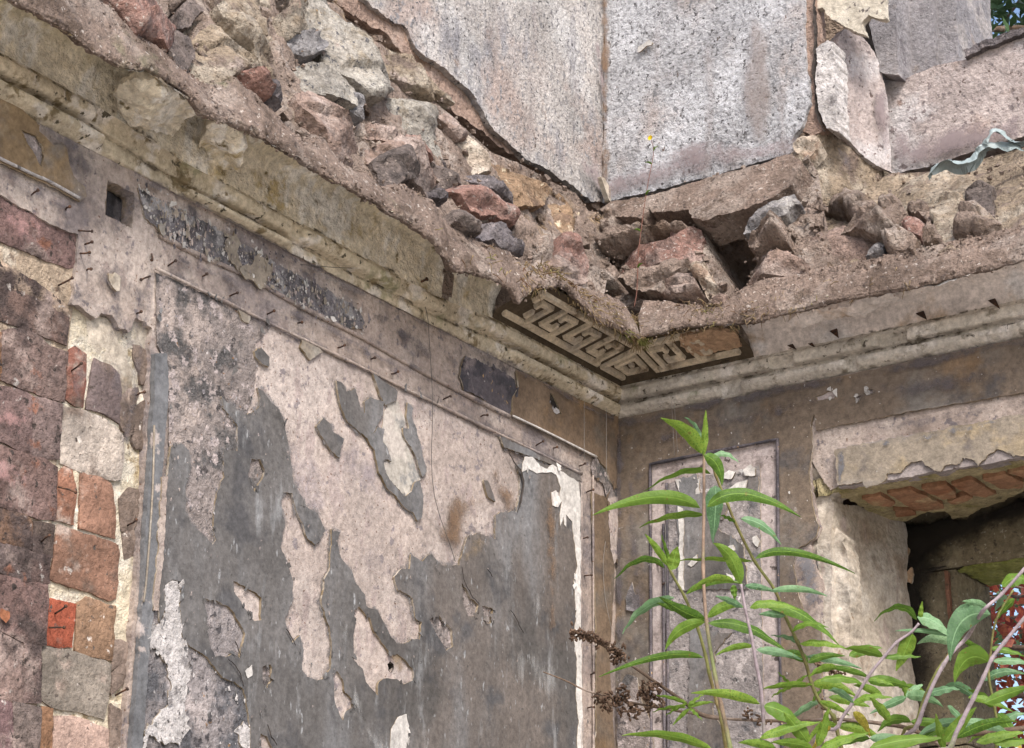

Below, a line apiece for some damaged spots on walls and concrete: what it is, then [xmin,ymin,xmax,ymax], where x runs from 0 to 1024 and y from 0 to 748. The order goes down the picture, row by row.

flaking render [815,40,851,143]
peeling [137,179,374,341]
flaking render [787,292,901,328]
peeling [69,272,618,748]
peeling [675,473,761,602]
peeling [724,464,760,492]
peeling [686,627,732,748]